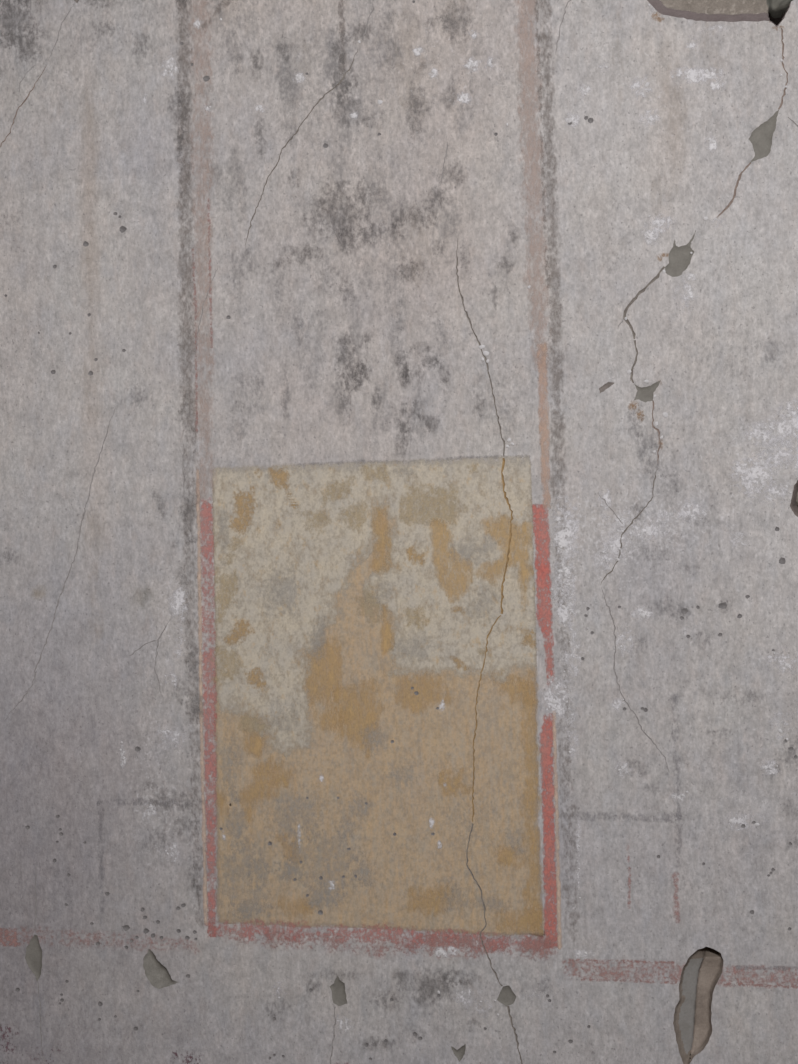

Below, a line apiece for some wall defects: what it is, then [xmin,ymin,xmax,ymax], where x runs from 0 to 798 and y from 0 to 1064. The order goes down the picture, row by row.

spalling [647,0,793,29]
crack [0,2,76,147]
crack [245,0,374,245]
peeling [671,67,724,90]
crack [778,28,798,127]
crack [703,163,751,220]
peeling [732,399,798,517]
crack [598,266,669,772]
crack [456,242,522,1064]
hole [673,947,723,1064]